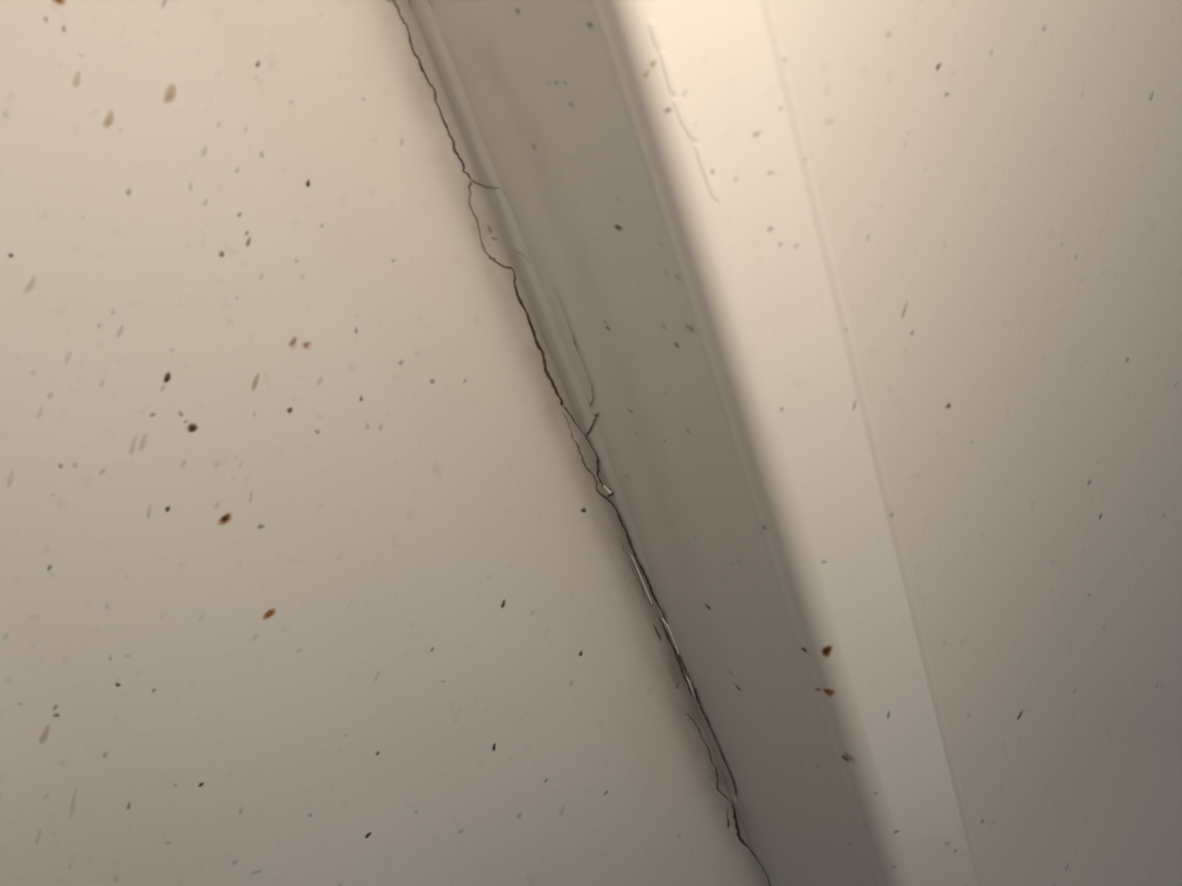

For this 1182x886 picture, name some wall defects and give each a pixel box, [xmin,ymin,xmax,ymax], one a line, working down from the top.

crack [393,0,494,190]
crack [489,256,770,886]